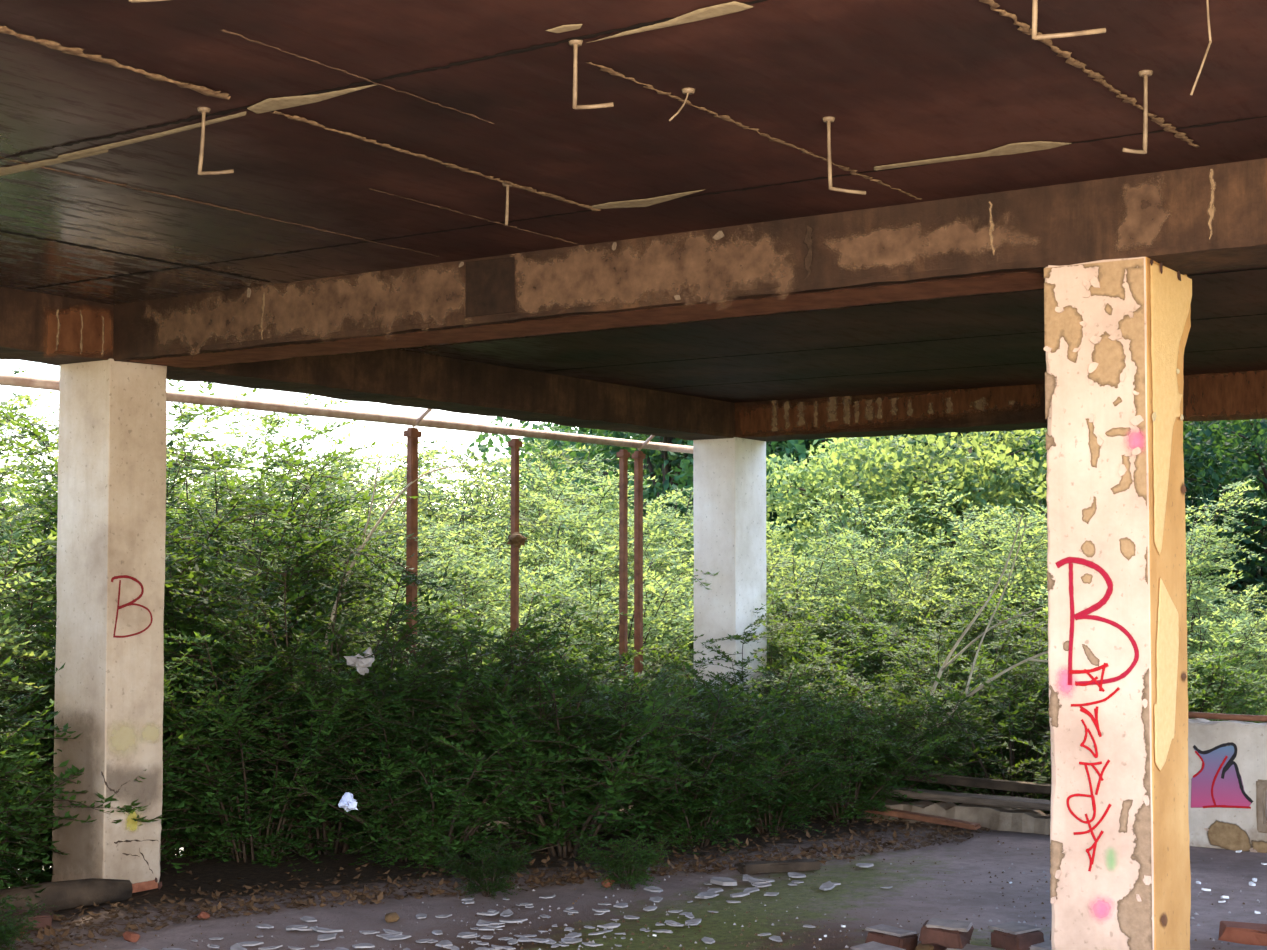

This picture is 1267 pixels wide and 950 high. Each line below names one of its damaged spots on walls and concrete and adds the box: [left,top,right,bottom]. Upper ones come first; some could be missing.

crack [742,0,767,8]
crack [300,15,682,96]
crack [0,104,255,160]
crack [1068,116,1267,145]
flaking render [0,58,795,356]
crack [673,159,964,200]
crack [0,210,592,289]
flaking render [824,214,1039,272]
flaking render [1043,179,1192,950]
spalling [850,917,1051,950]